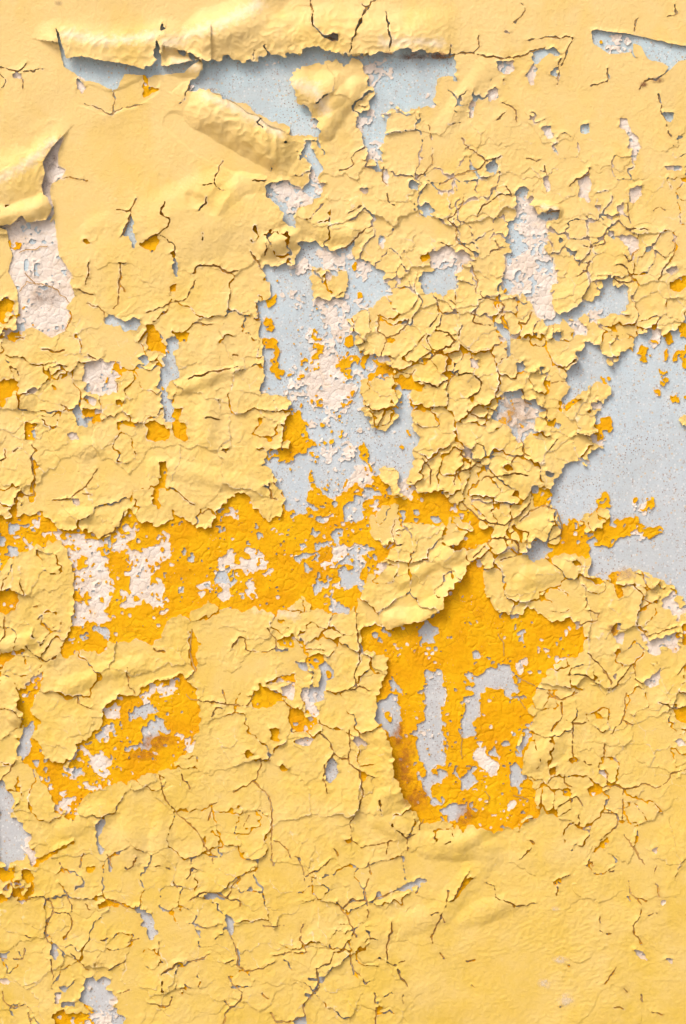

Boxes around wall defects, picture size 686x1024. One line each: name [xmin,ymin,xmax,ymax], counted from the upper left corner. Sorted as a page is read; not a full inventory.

peeling [53,0,483,228]
peeling [467,36,573,122]
peeling [591,18,686,137]
peeling [0,118,686,905]
crack [338,613,370,693]
crack [319,731,375,812]
crack [600,769,686,944]
crack [25,896,137,980]
peeling [95,896,160,955]
peeling [199,889,243,970]
crack [223,934,291,1024]
crack [294,879,408,1021]